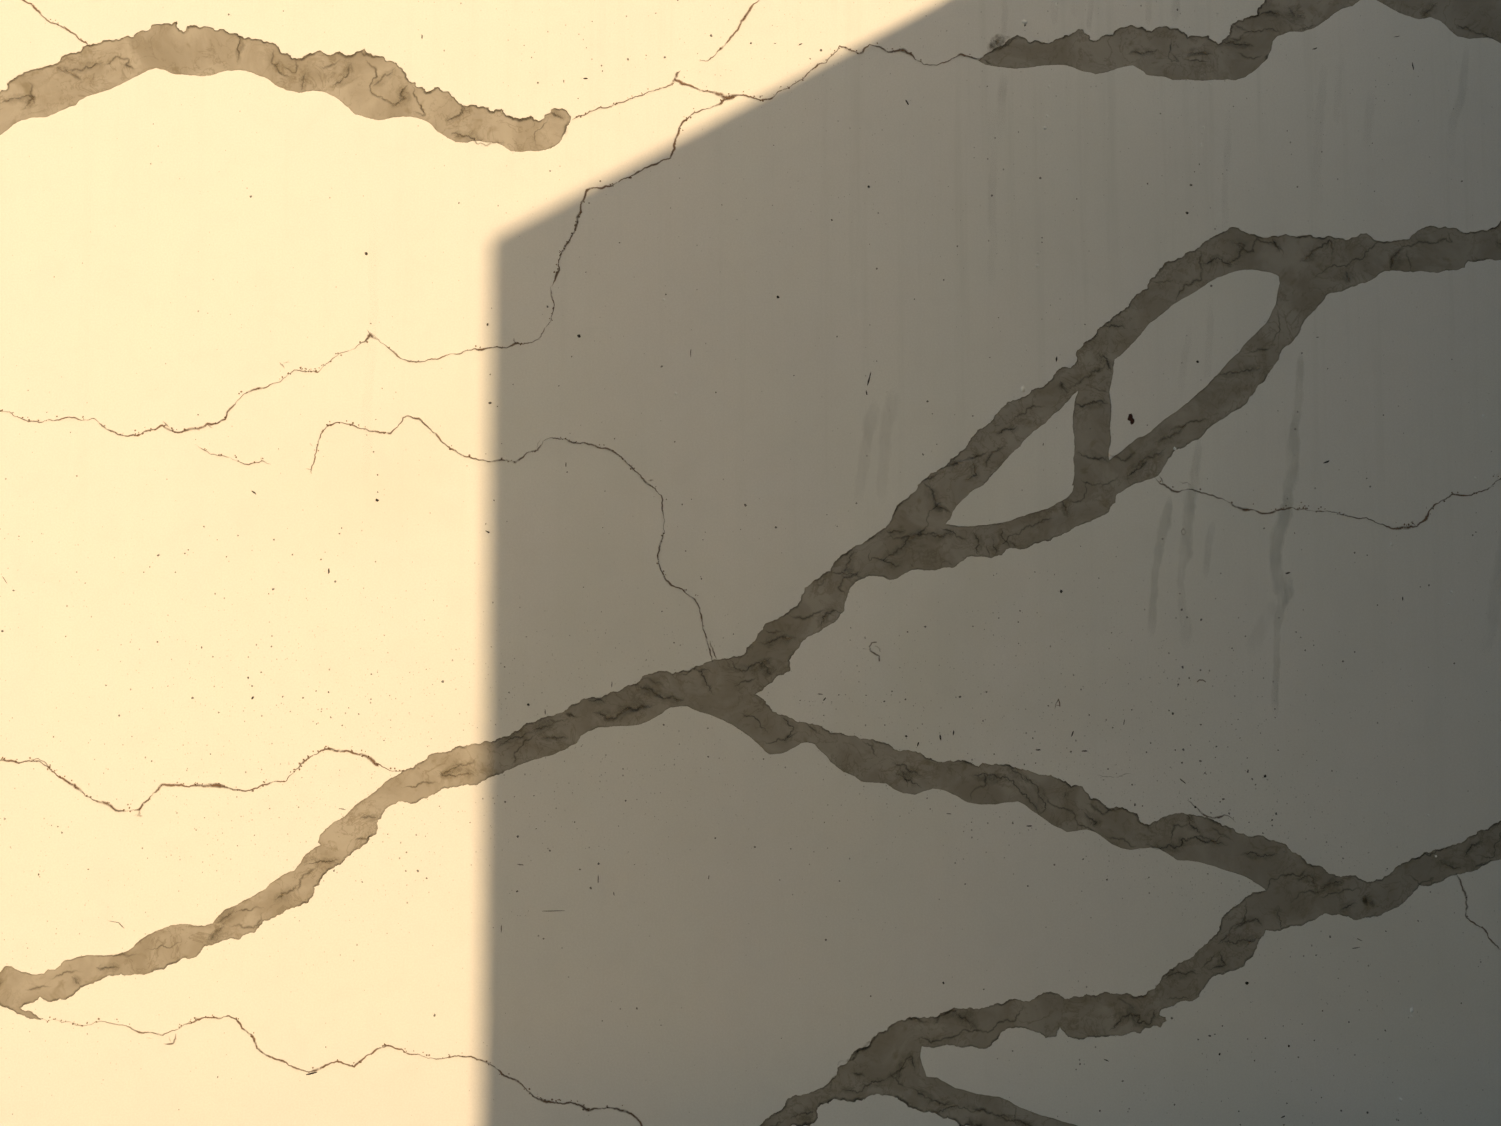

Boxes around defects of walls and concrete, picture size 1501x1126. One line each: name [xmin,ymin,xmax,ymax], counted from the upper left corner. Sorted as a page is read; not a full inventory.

crack [0,0,1501,469]
crack [553,437,665,521]
crack [1229,502,1309,514]
crack [1316,476,1501,530]
crack [656,526,688,595]
crack [1,757,270,812]
crack [277,746,338,782]
crack [361,754,390,771]
crack [1458,877,1499,948]
crack [124,1015,434,1073]
crack [443,1054,642,1126]